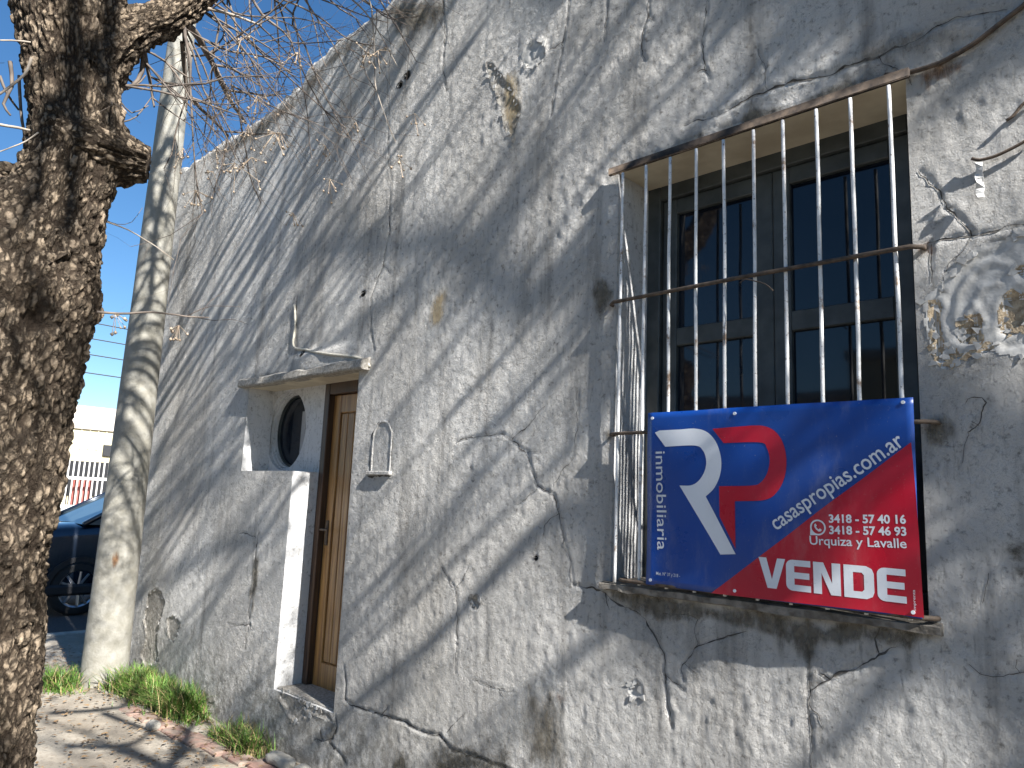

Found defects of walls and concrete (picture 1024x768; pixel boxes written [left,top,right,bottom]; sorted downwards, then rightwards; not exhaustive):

flaking render [485,62,521,142]
flaking render [521,36,546,69]
crack [686,9,1006,126]
crack [918,171,1024,283]
flaking render [916,228,1024,369]
crack [962,397,987,463]
crack [459,391,746,726]
flaking render [141,588,181,666]
crack [440,564,506,695]
crack [314,668,506,768]
flaking render [625,679,645,701]
crack [808,628,894,768]